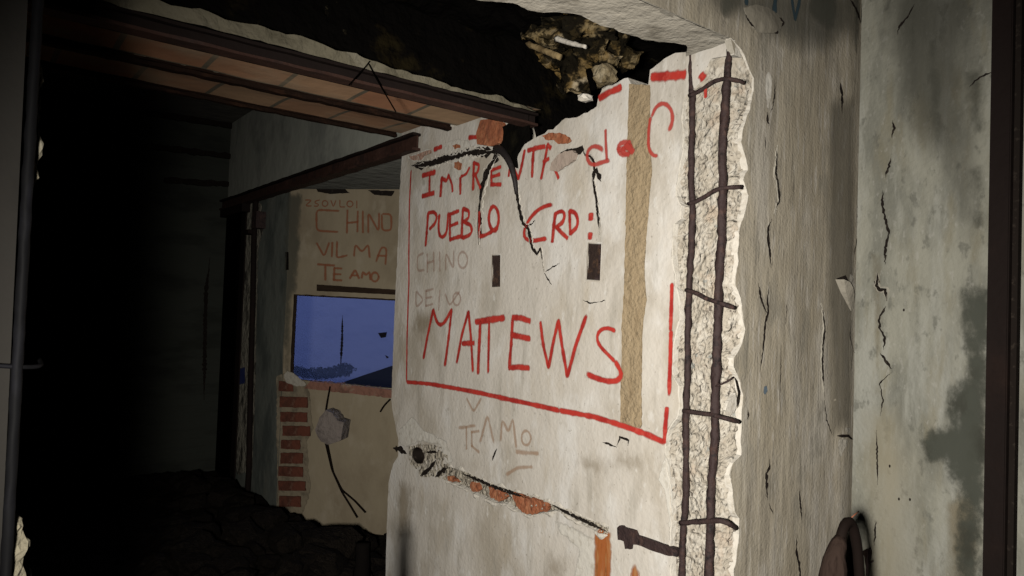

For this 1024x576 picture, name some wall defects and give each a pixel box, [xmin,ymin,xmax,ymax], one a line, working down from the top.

spalling [521,13,643,95]
spalling [276,363,357,514]
crack [411,145,500,245]
spalling [399,417,609,576]
crack [515,180,557,285]
crack [583,151,601,237]
spalling [659,38,775,576]
crack [758,112,787,400]
crack [820,303,855,434]
crack [854,121,896,485]
damp [923,290,987,576]